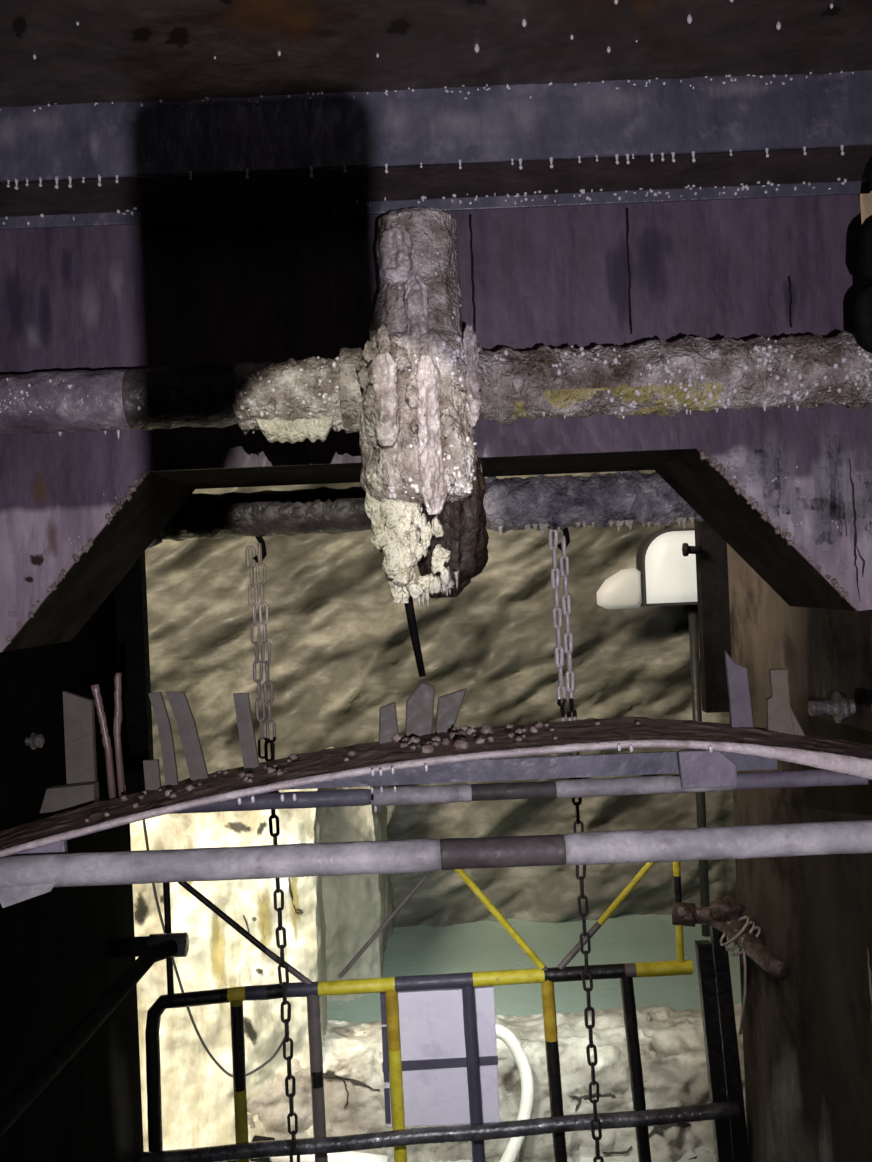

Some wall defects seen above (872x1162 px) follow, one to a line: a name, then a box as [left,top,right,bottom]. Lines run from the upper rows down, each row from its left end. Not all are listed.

crack [849,458,865,602]
leakage [225,822,267,834]
leakage [134,894,163,923]
leakage [252,896,271,945]
leakage [291,877,303,939]
leakage [211,914,235,989]
leakage [243,1017,257,1044]